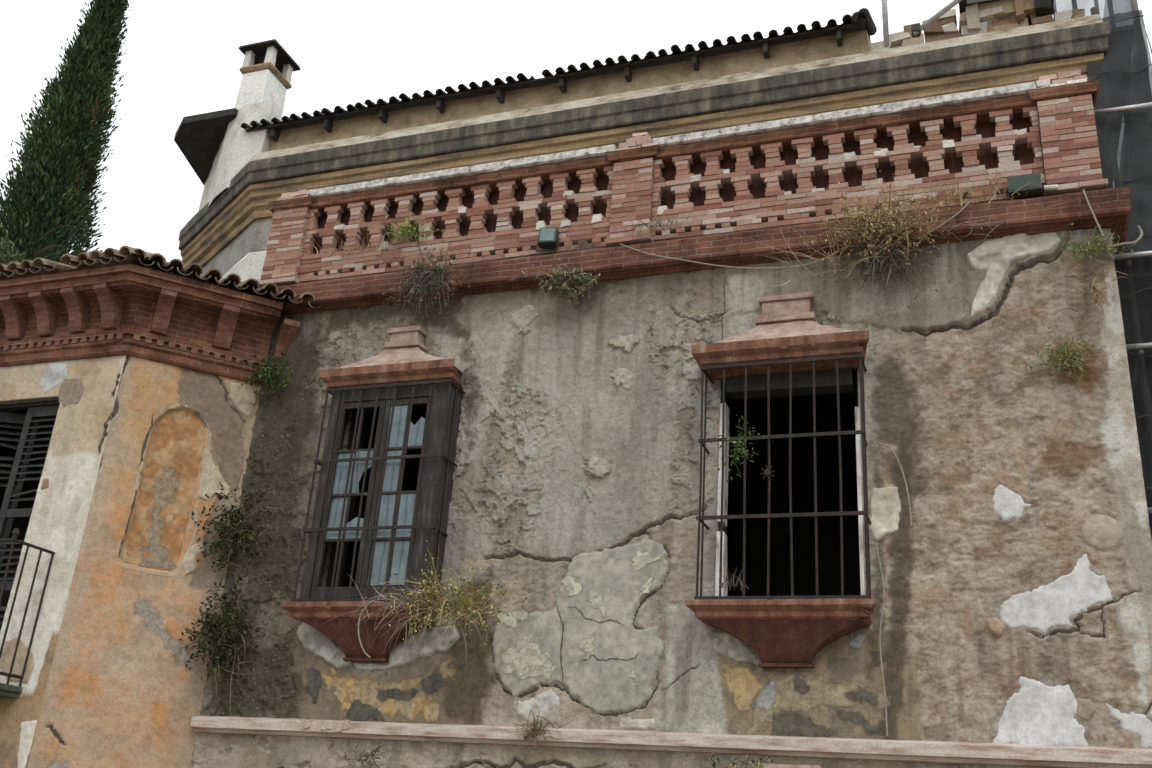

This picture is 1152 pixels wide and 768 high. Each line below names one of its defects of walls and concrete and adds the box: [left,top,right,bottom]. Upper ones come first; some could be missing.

flaking render [903,232,1069,337]
crack [98,356,129,467]
spalling [177,369,260,501]
crack [486,552,571,563]
crack [599,508,706,557]
spalling [992,485,1031,521]
spalling [985,554,1141,640]
flaking render [17,720,37,768]
peeling [297,622,460,723]
crack [459,759,573,768]
peeling [708,631,890,738]
spalling [990,676,1152,749]